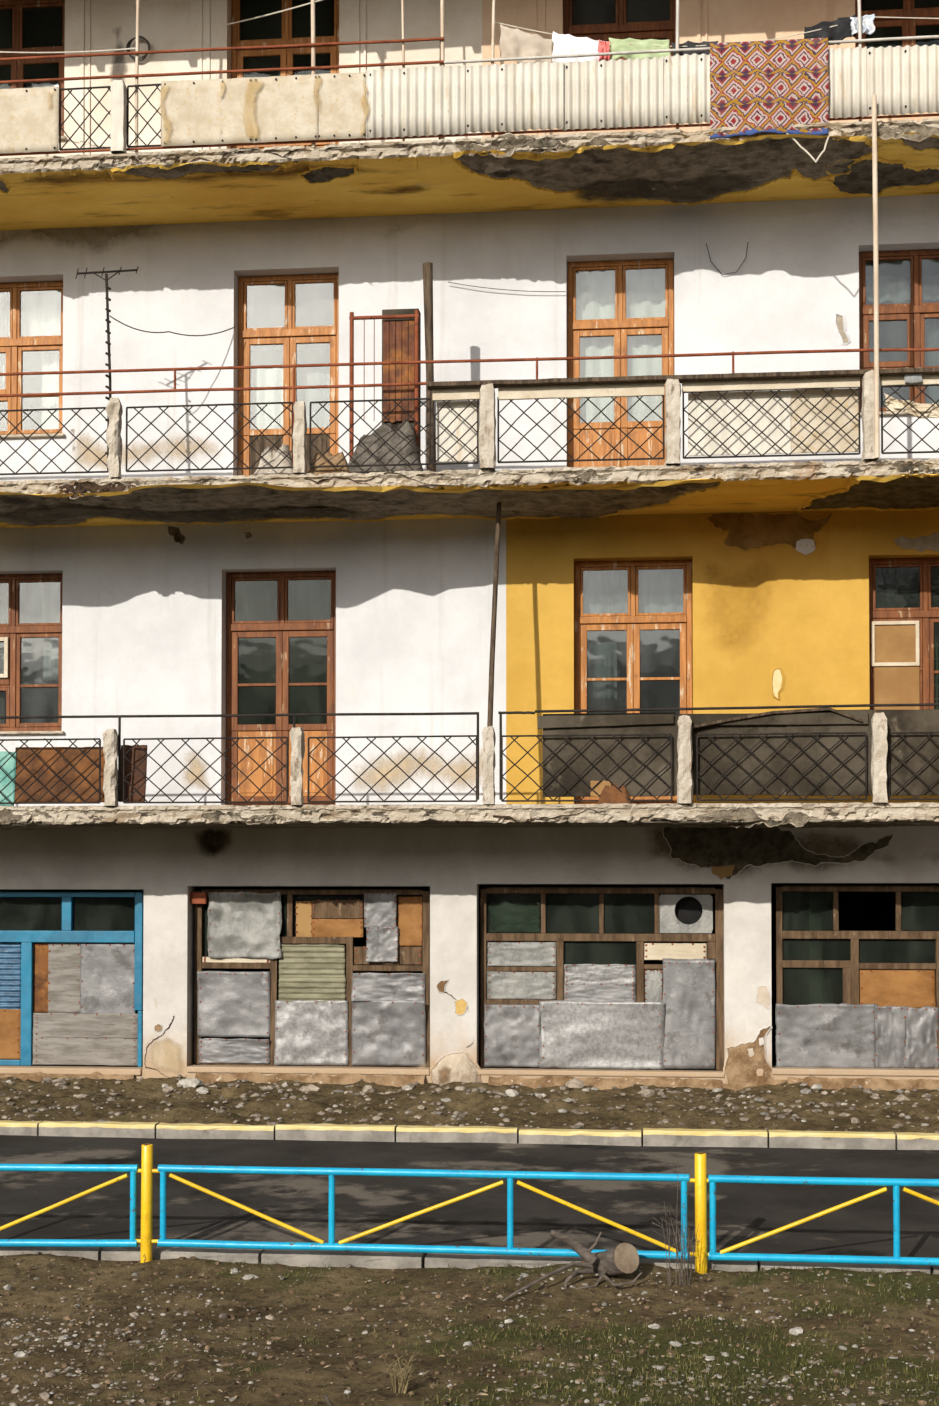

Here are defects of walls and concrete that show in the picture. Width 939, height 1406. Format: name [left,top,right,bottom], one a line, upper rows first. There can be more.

spalling [0,179,12,194]
spalling [449,123,939,206]
spalling [0,468,726,548]
peeling [704,460,939,556]
peeling [623,806,931,880]